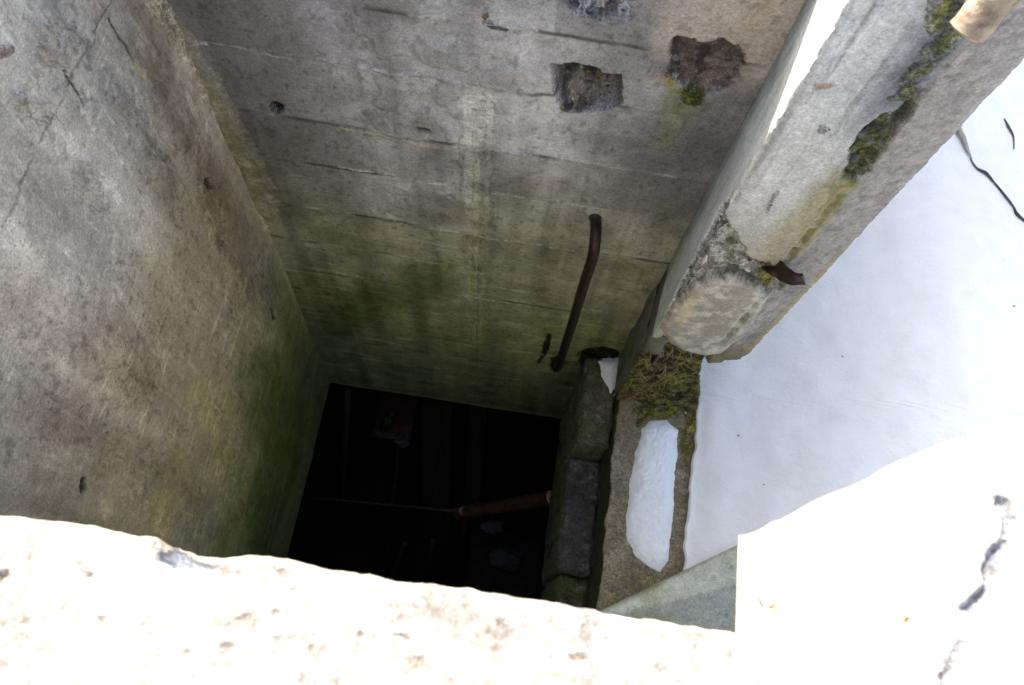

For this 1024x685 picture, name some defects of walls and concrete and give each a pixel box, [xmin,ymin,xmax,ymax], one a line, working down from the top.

spalling [550,62,623,114]
spalling [560,0,637,22]
spalling [664,35,747,106]
leakage [804,0,886,106]
leakage [833,19,921,135]
leakage [337,0,576,385]
spalling [670,189,785,308]
crack [936,496,1024,685]